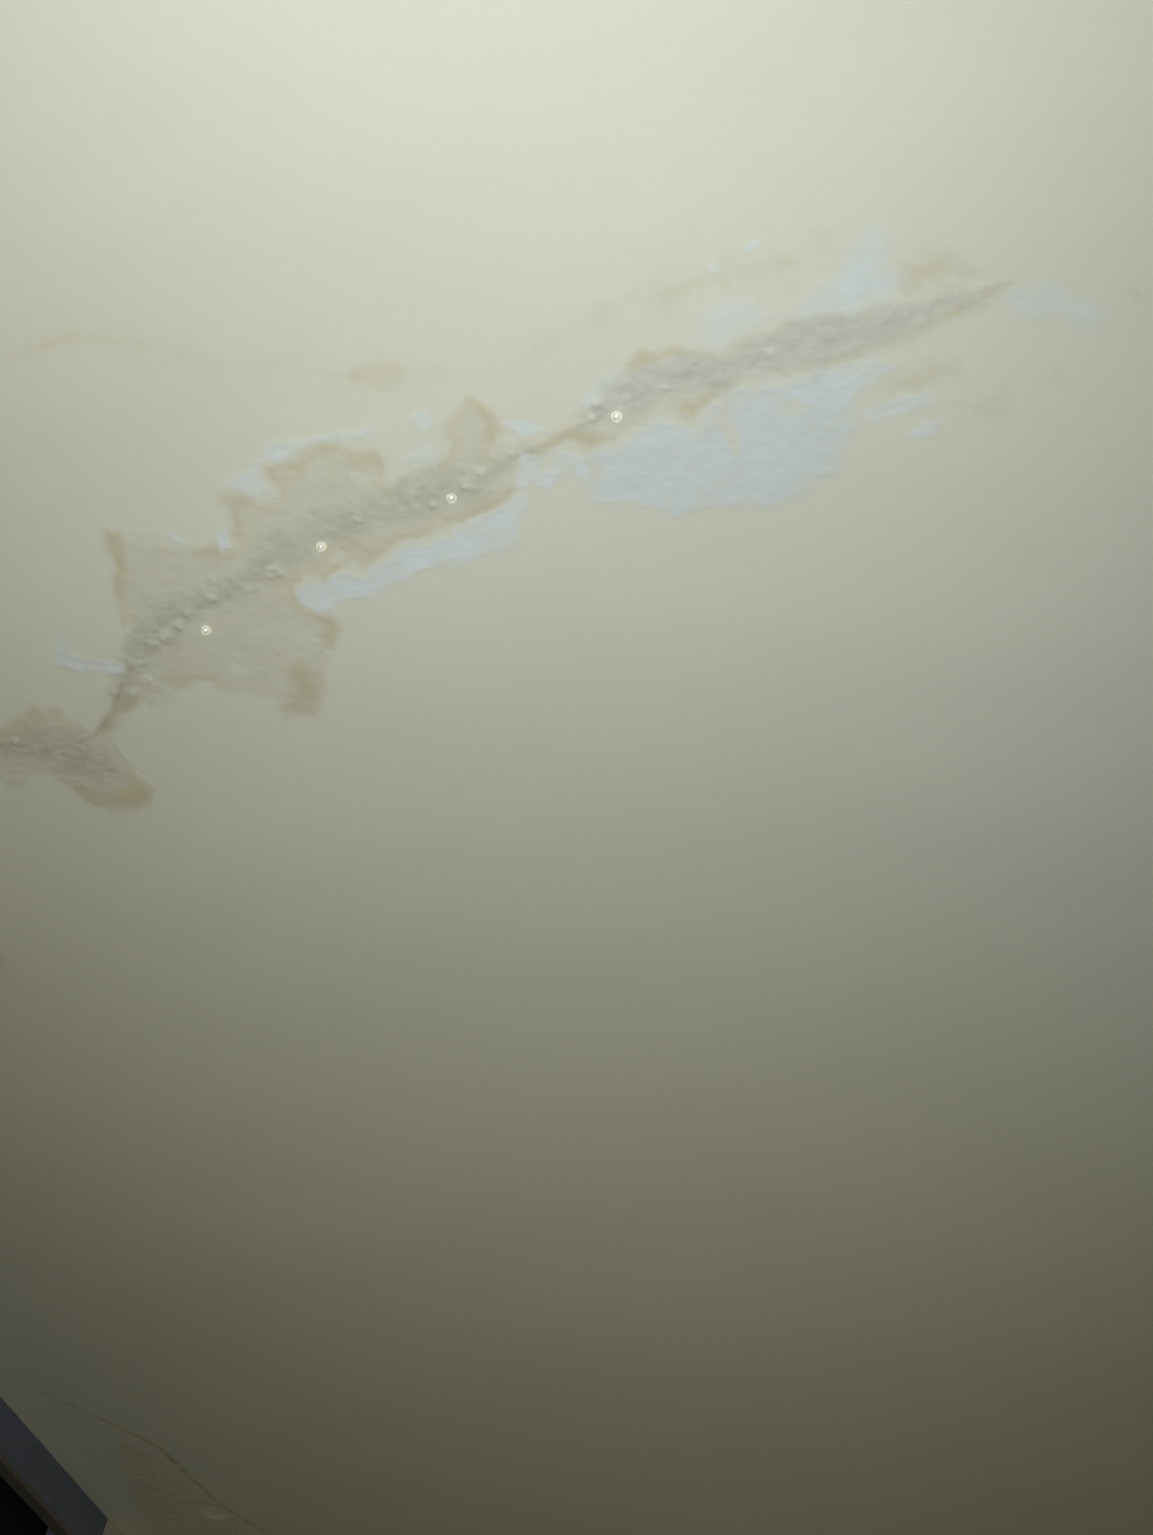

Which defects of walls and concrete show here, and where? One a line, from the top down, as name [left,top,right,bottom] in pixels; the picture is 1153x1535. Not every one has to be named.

damp [0,217,1028,817]
peeling [287,352,947,620]